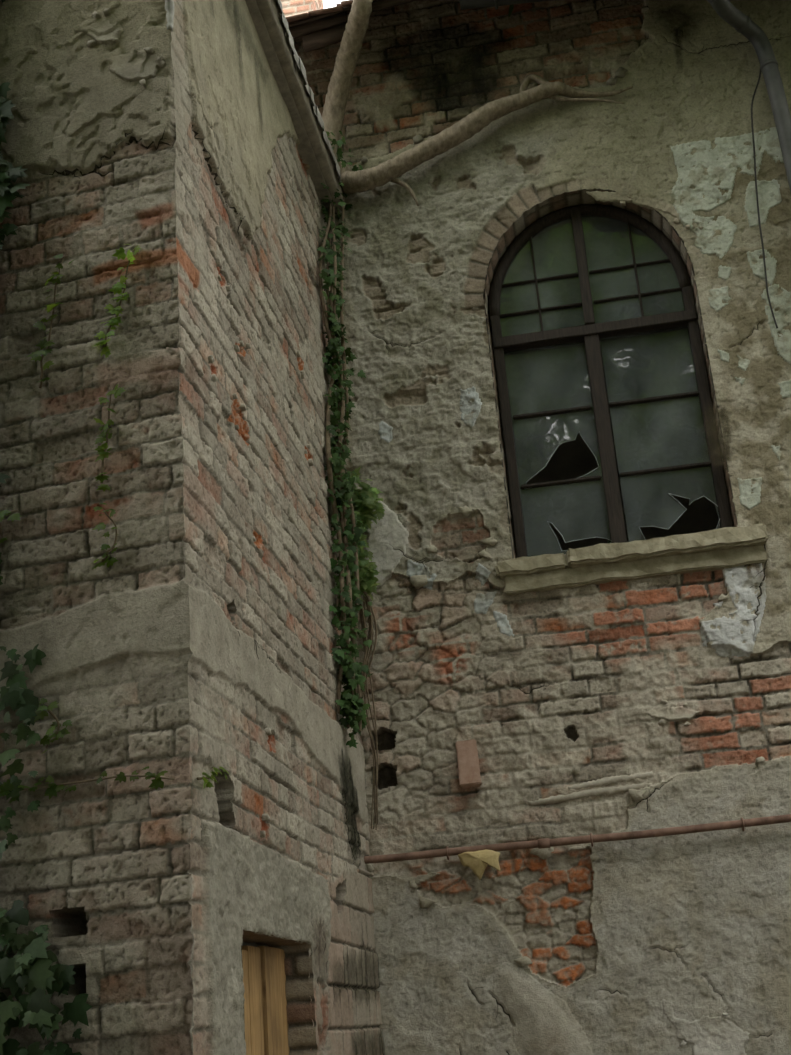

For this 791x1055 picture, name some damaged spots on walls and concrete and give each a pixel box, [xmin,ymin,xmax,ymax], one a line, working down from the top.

damp [382,25,512,108]
peeling [378,421,393,444]
spalling [355,500,791,988]
crack [468,986,514,1026]
peeling [662,999,750,1055]